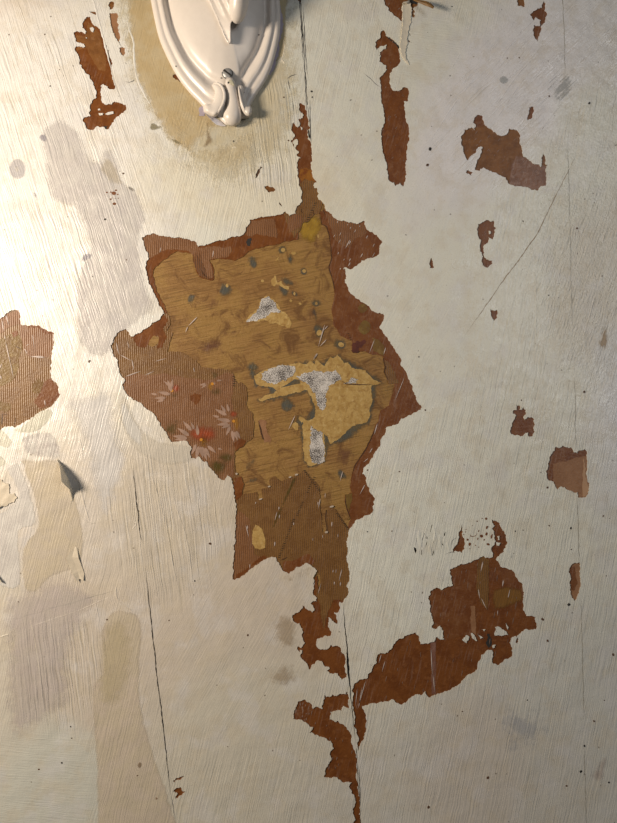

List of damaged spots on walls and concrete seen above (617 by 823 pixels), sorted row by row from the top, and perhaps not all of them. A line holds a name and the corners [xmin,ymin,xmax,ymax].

water stain [44,122,150,354]
peeling [74,12,126,130]
water stain [122,0,297,179]
crack [299,0,311,139]
peeling [375,0,434,186]
peeling [461,115,546,190]
peeling [0,310,60,466]
peeling [111,103,422,679]
peeling [546,446,589,498]
crack [147,583,169,776]
crack [343,606,361,823]
peeling [293,518,537,823]